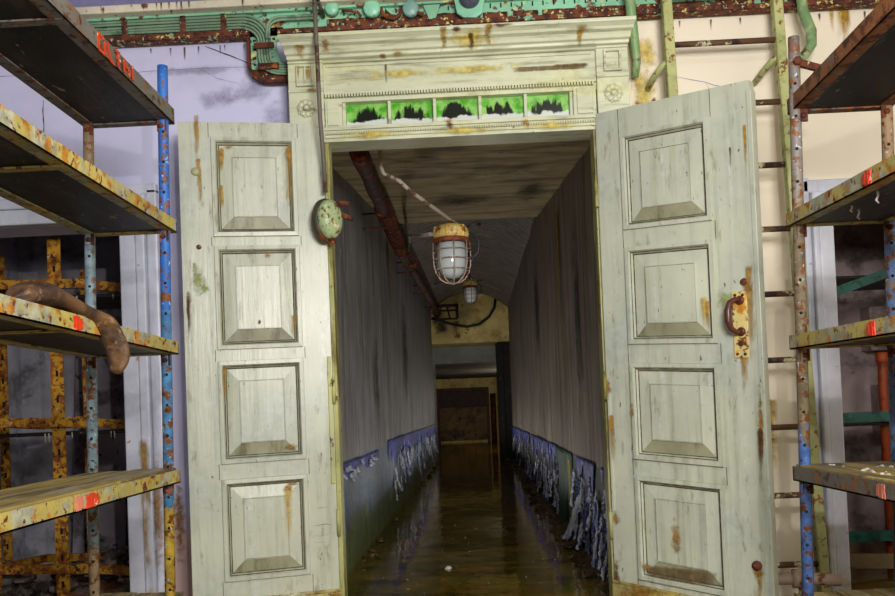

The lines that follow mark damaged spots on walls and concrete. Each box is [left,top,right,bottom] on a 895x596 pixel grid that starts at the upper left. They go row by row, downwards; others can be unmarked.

rust [441,24,509,47]
leakage [640,43,653,63]
peeling [343,424,439,500]
peeling [512,426,619,582]